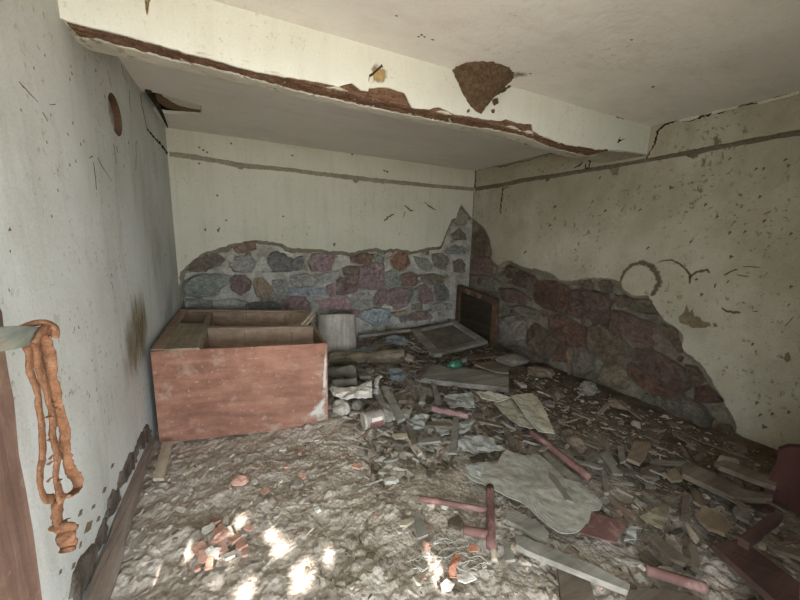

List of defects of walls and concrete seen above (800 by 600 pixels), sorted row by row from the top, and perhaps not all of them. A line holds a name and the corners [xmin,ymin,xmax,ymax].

crack [107,64,168,155]
spalling [67,22,608,155]
corrosion [372,67,392,82]
crack [646,96,779,159]
flaking render [179,205,650,309]
water stain [128,301,146,371]
flaking render [655,305,739,435]
flaking render [59,424,152,600]